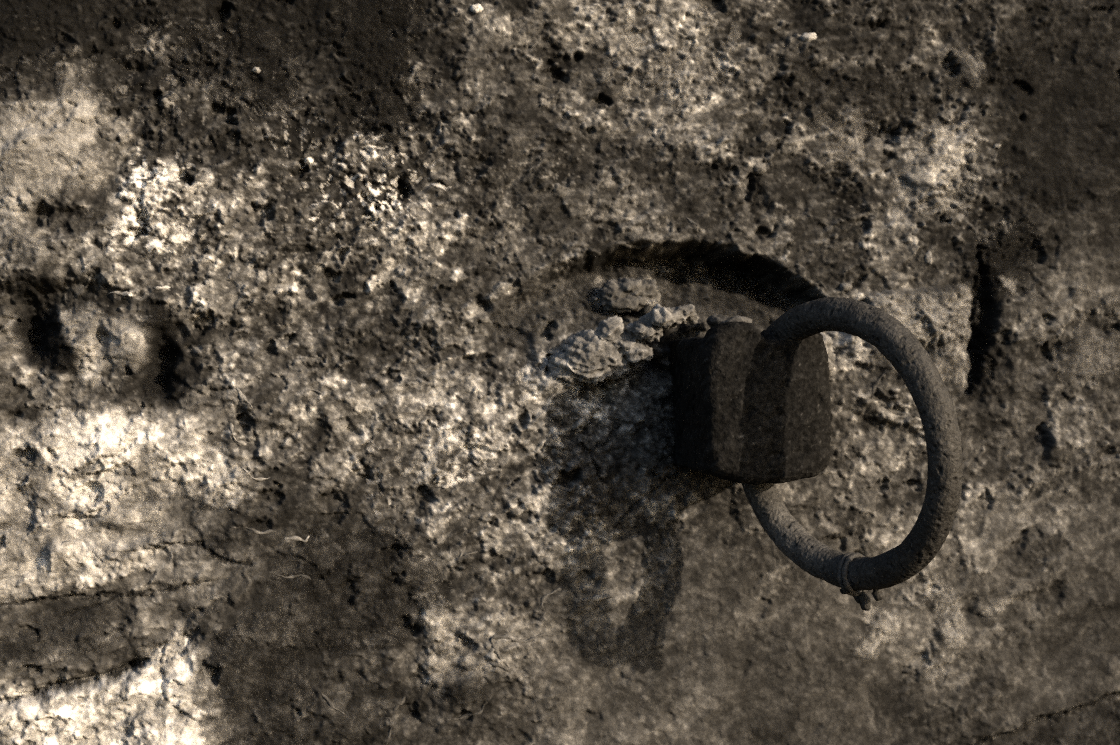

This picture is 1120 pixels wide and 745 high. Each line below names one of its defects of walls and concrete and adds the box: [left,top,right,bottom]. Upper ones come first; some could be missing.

spalling [490,241,810,346]
crack [974,691,1120,745]